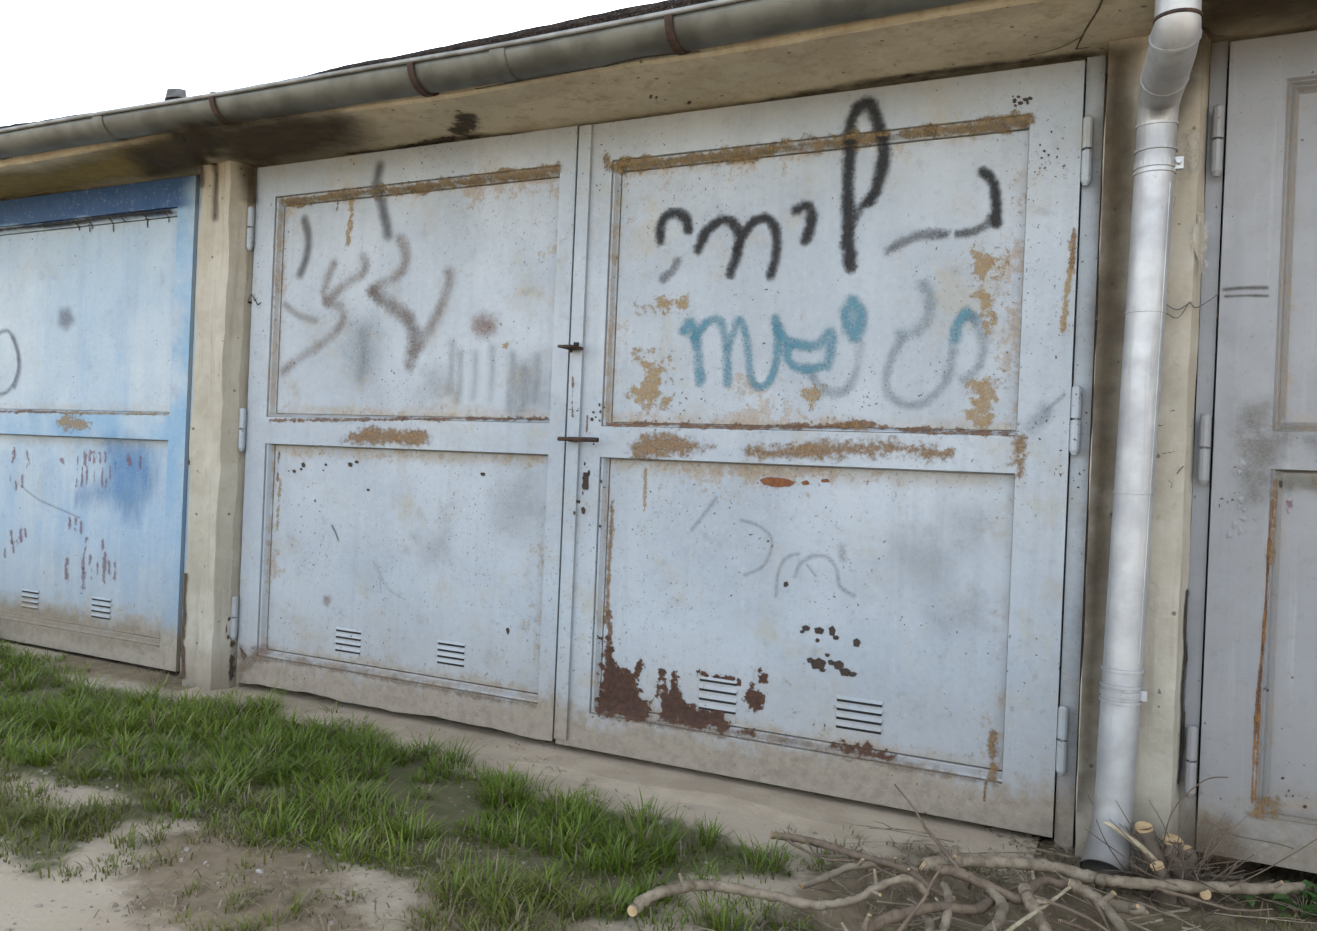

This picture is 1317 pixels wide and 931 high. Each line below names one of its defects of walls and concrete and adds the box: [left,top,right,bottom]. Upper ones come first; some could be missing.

corrosion [603,109,1035,175]
corrosion [281,162,561,245]
corrosion [634,292,689,315]
corrosion [970,244,1009,334]
corrosion [269,416,548,446]
corrosion [606,347,1027,511]
corrosion [1248,479,1279,819]